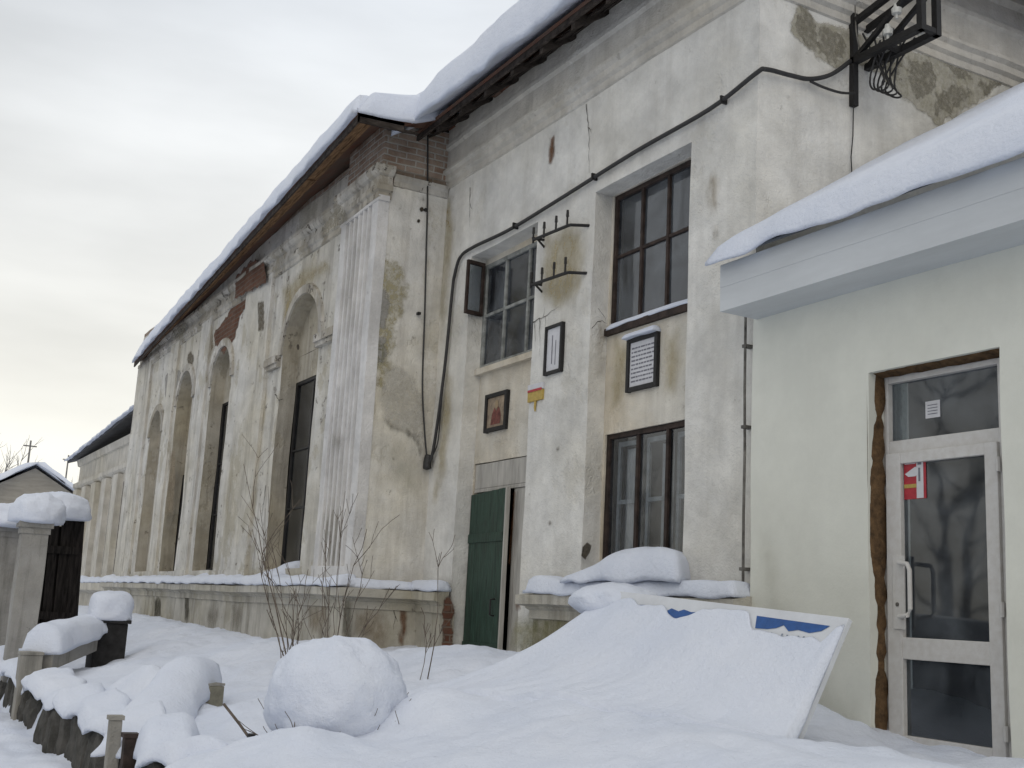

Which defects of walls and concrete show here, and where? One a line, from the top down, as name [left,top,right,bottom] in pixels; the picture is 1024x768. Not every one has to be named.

peeling [791,6,1001,126]
flaking render [214,259,266,354]
flaking render [442,597,454,646]